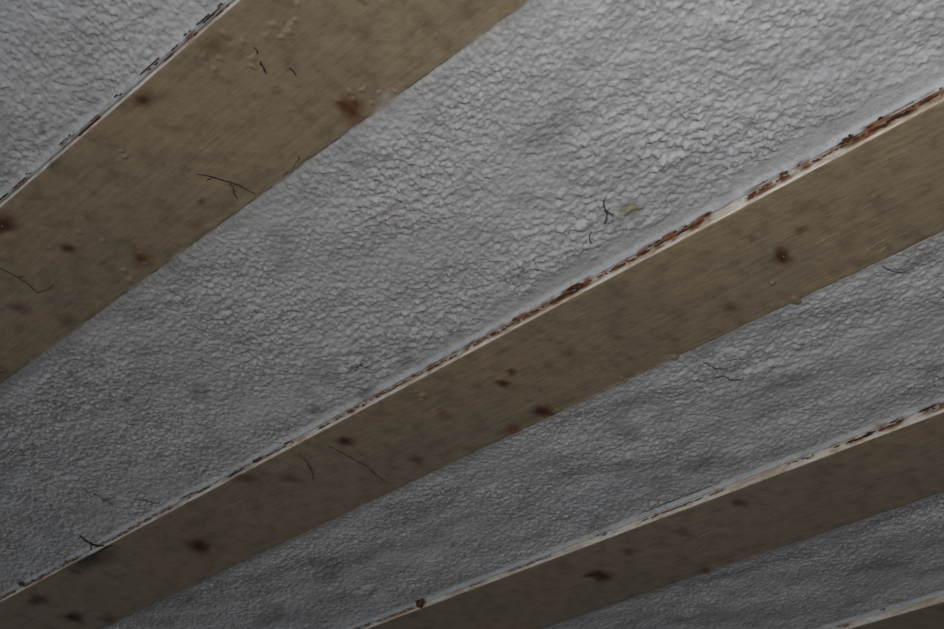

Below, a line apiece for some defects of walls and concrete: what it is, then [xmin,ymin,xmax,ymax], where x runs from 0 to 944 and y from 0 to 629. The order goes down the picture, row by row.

corrosion [140,3,229,75]
corrosion [747,87,942,200]
corrosion [834,417,904,448]